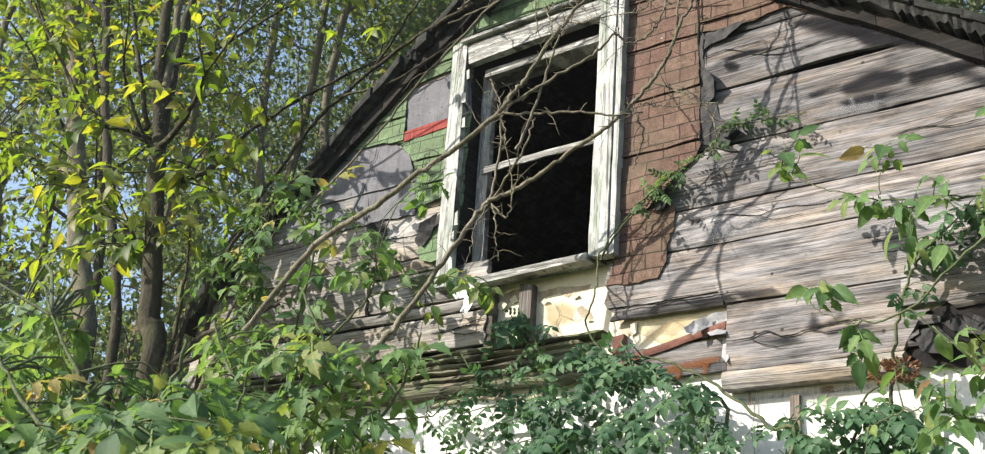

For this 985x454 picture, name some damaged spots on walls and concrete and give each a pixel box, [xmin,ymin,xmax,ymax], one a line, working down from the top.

peeling [446,210,458,271]
flaking render [498,288,520,311]
flaking render [537,284,593,322]
flaking render [620,319,637,339]
peeling [683,311,729,362]
rust [665,356,718,378]